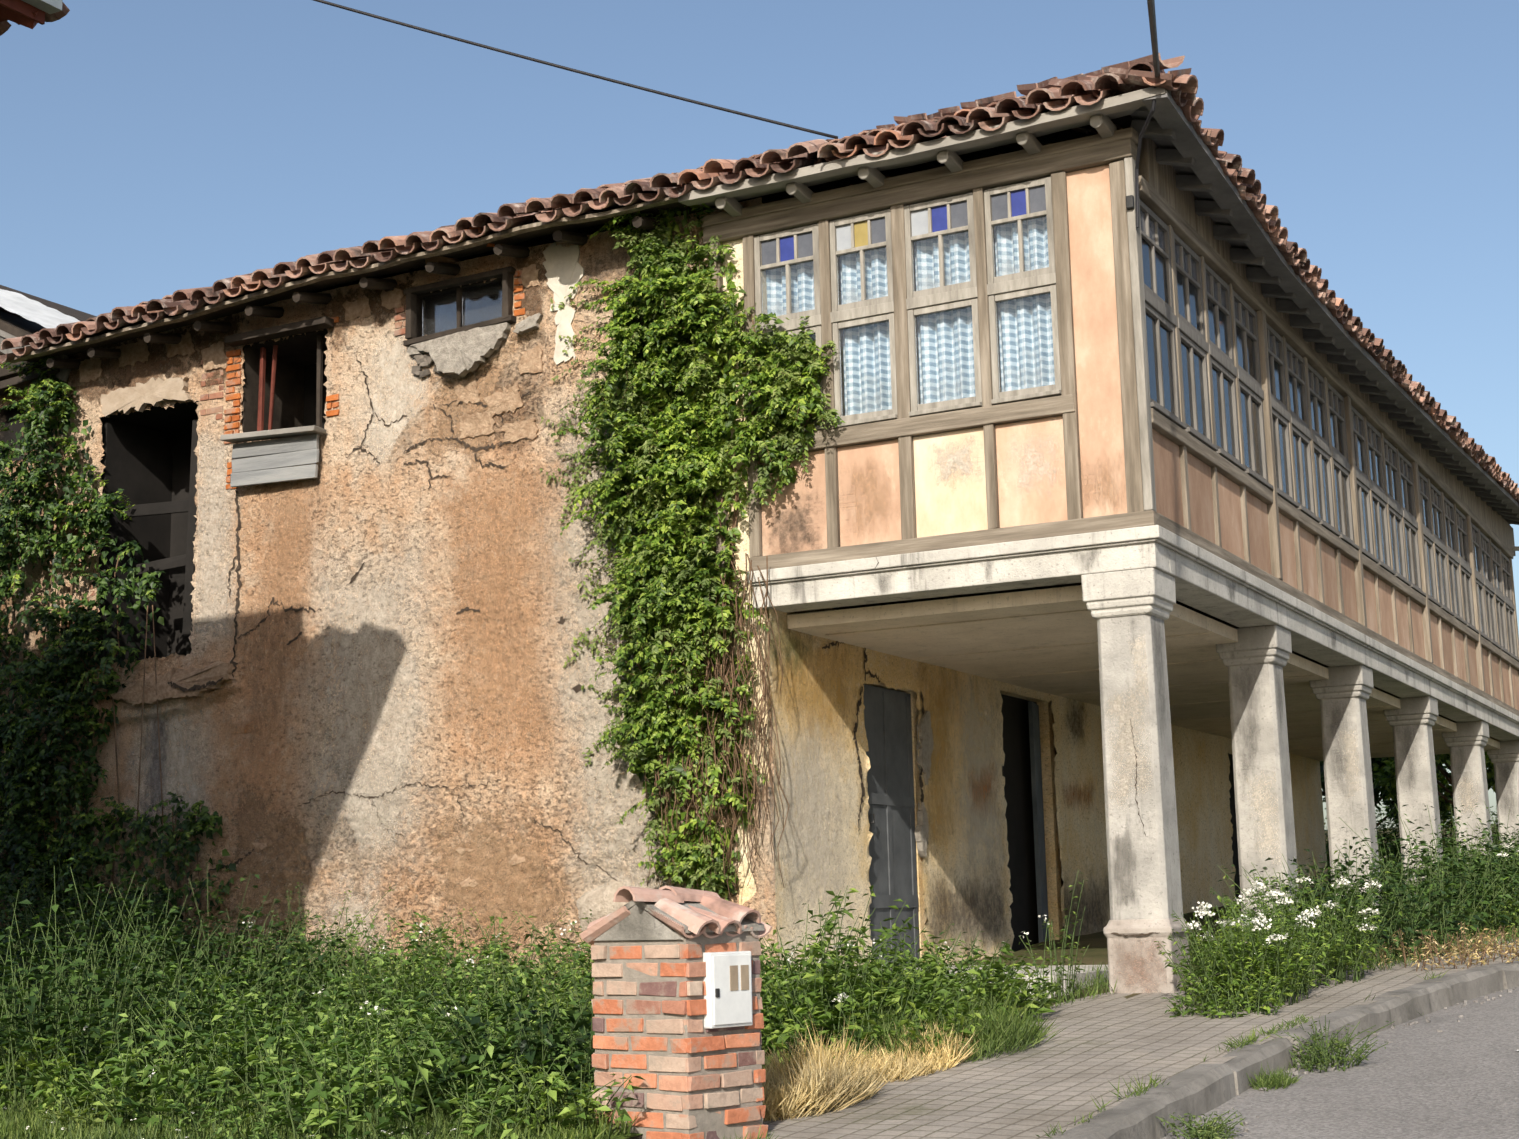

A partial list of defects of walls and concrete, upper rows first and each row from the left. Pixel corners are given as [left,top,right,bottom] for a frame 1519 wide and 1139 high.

spalling [319,245,548,473]
crack [346,354,538,489]
crack [168,488,321,692]
crack [297,779,499,838]
crack [822,641,880,831]
crack [917,766,925,802]
crack [1130,720,1146,837]
damp [931,882,1003,944]
damp [1064,881,1109,936]